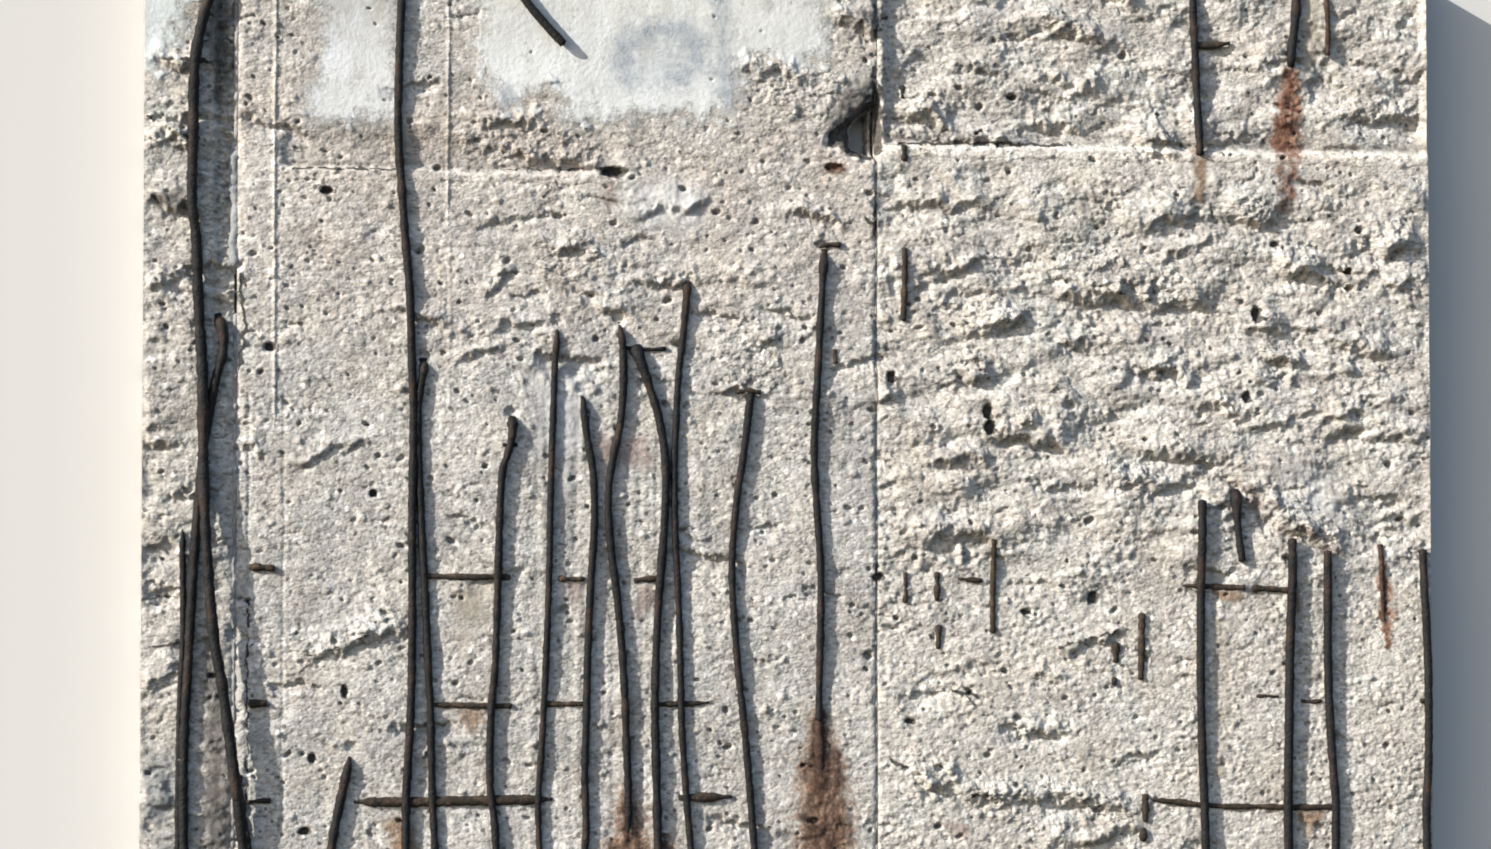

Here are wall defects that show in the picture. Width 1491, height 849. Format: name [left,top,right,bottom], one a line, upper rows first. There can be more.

peeling [454,0,953,179]
rust [1270,67,1303,211]
rust [1376,562,1396,649]
rust [599,790,677,849]
rust [787,709,858,849]